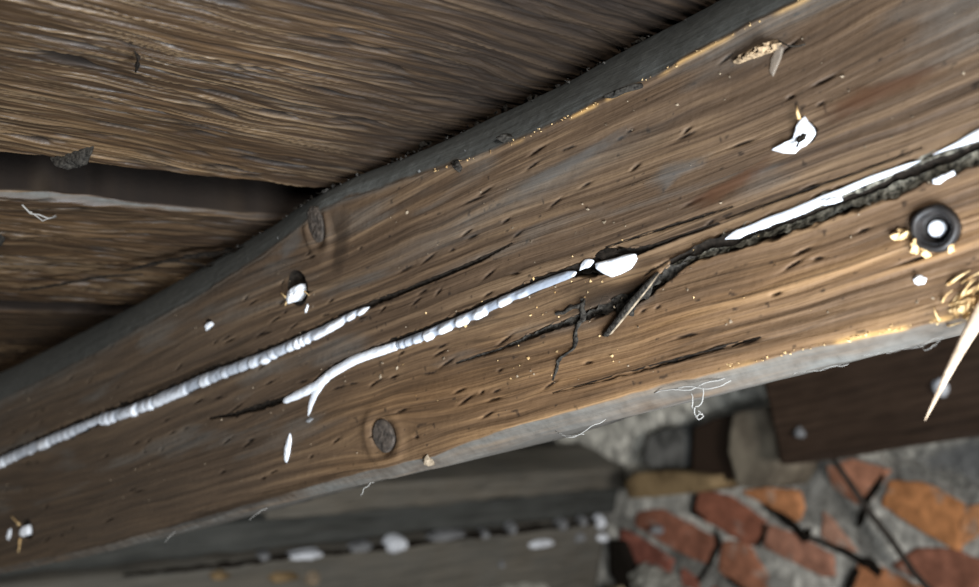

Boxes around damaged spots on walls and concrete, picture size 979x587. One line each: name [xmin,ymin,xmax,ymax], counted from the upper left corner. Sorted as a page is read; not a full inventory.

crack [210,141,979,419]